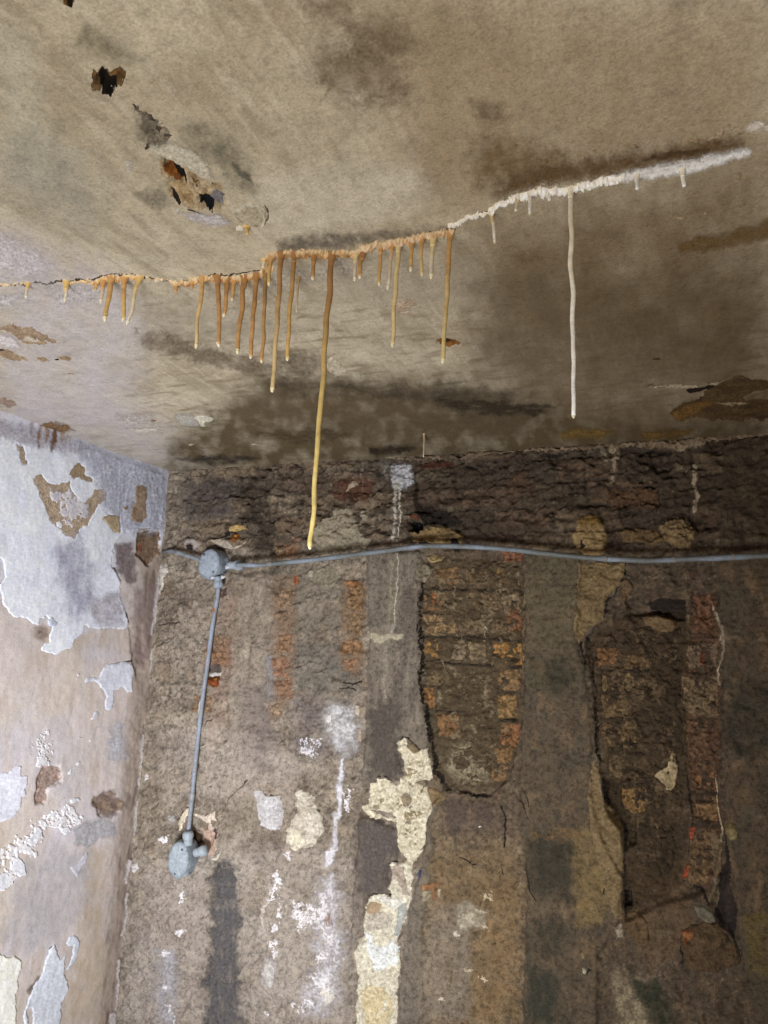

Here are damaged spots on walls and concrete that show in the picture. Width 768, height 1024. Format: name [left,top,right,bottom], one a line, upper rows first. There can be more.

spalling [83,66,127,104]
flaking render [131,103,229,226]
crack [0,149,751,290]
water stain [482,140,743,197]
water stain [143,335,357,389]
peeling [0,422,165,655]
water stain [369,446,414,541]
flaking render [354,375,768,1024]
peeling [0,729,124,891]
water stain [259,554,404,1017]
peeling [0,935,80,1024]
water stain [201,862,243,1024]